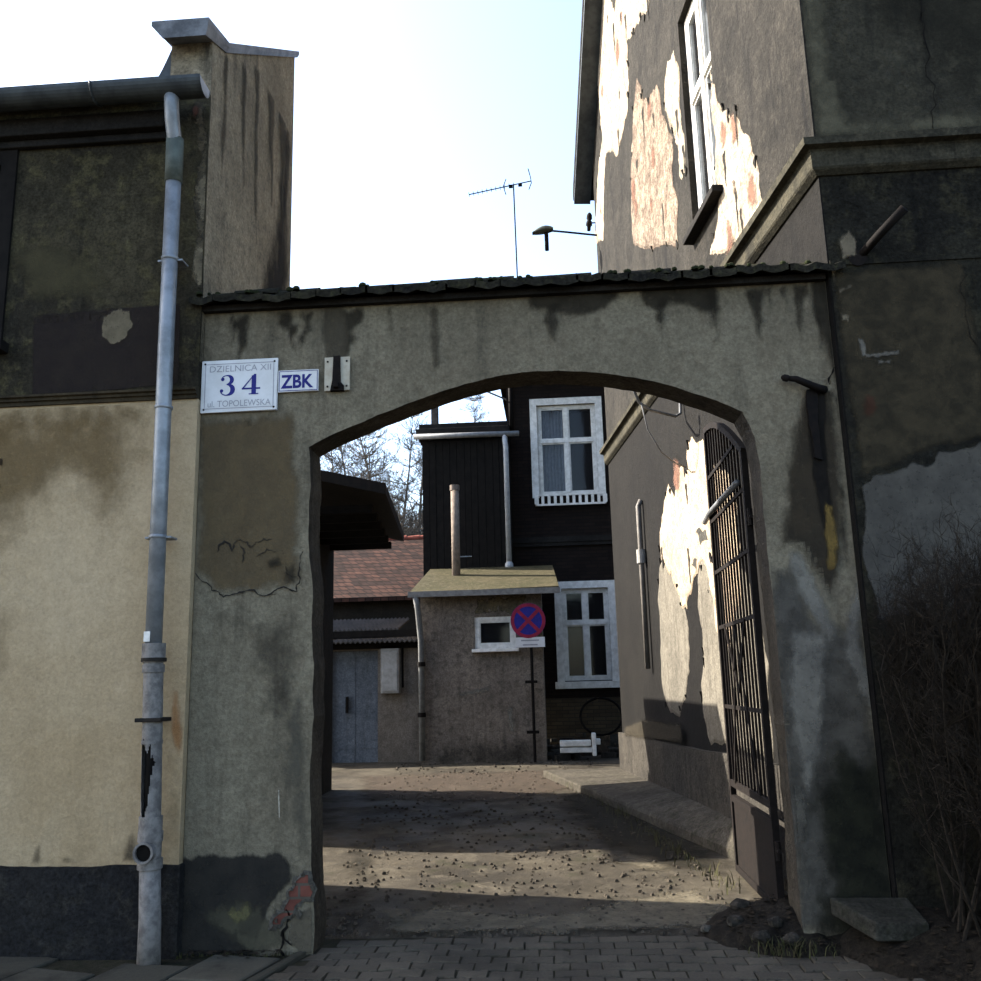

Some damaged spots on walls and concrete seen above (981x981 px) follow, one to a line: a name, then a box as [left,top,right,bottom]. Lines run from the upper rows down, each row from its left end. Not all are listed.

damp [242,66,290,290]
peeling [595,0,687,252]
peeling [708,73,762,255]
peeling [102,309,133,344]
damp [279,312,312,343]
damp [322,307,363,357]
damp [529,293,617,335]
damp [641,287,719,322]
corrosion [784,392,845,591]
crack [195,551,303,598]
peeling [657,437,787,758]
spalling [268,870,317,953]